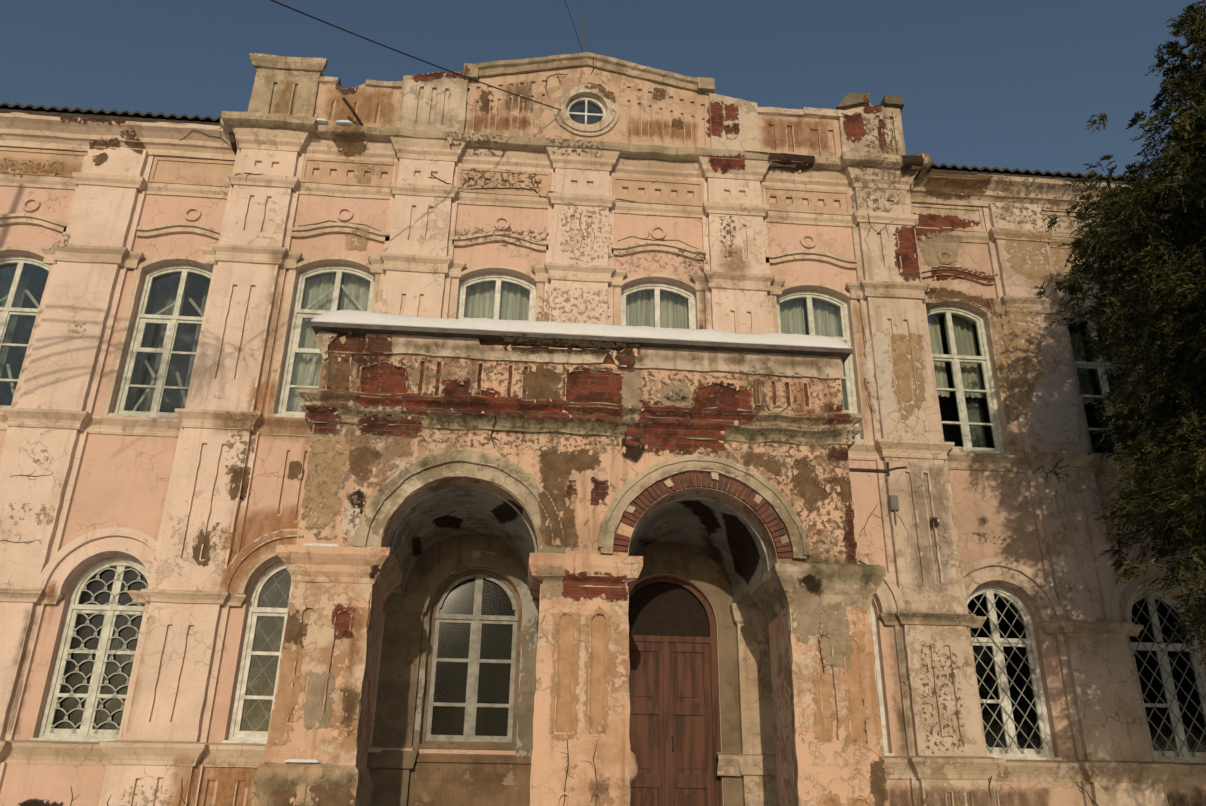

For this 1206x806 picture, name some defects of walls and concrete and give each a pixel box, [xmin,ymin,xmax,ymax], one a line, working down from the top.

spalling [706,100,740,137]
peeling [841,94,1105,446]
peeling [287,287,868,747]
peeling [192,522,231,567]
peeling [267,609,360,748]
spalling [817,757,888,806]
water stain [890,790,1048,806]
water stain [1167,789,1206,806]